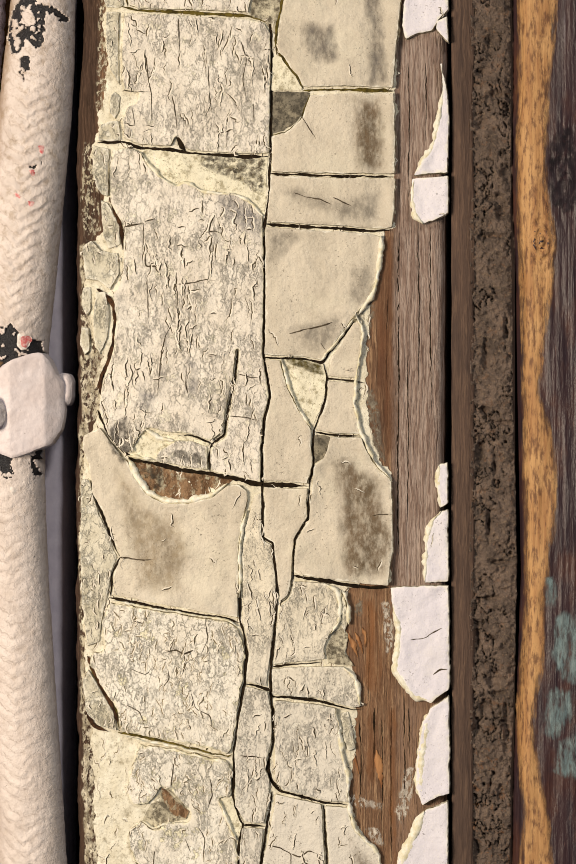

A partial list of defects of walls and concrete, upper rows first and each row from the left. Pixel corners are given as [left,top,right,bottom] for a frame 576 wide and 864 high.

peeling [17,333,32,350]
crack [85,0,432,864]
peeling [78,0,451,864]